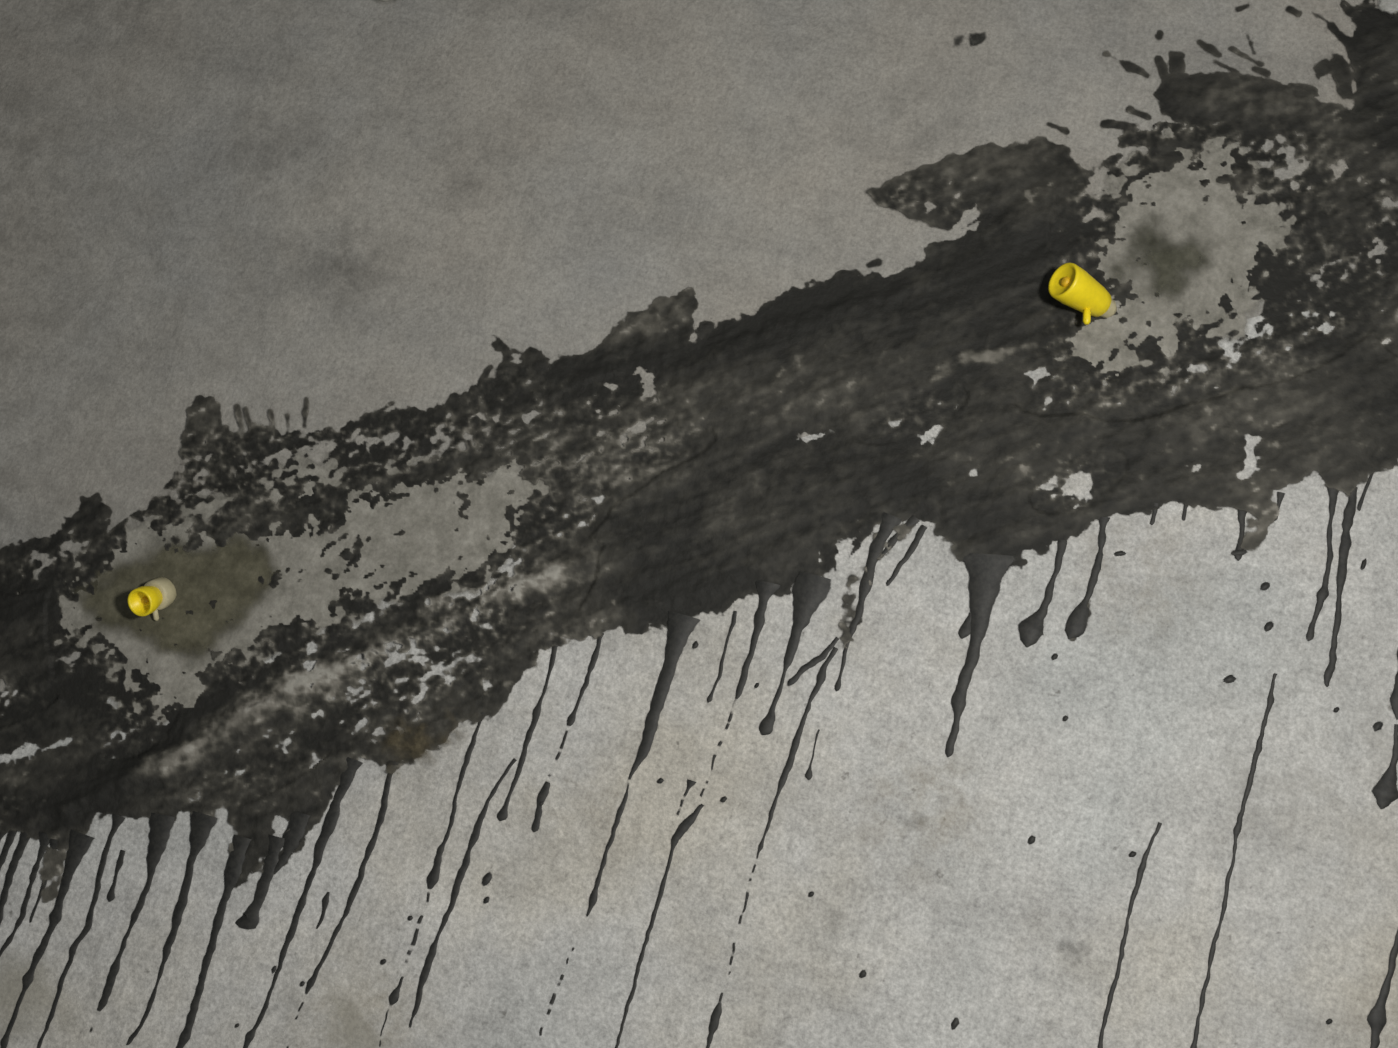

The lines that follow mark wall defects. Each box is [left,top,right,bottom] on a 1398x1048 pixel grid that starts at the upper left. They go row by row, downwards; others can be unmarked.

damp [866,136,1085,234]
damp [1154,35,1376,161]
damp [1313,0,1398,95]
damp [80,534,282,661]
damp [759,572,831,735]
damp [835,512,916,691]
damp [945,553,1016,757]
damp [586,611,700,916]
damp [0,829,95,1048]
damp [127,811,217,1045]
damp [176,834,252,1048]
damp [236,757,363,1048]